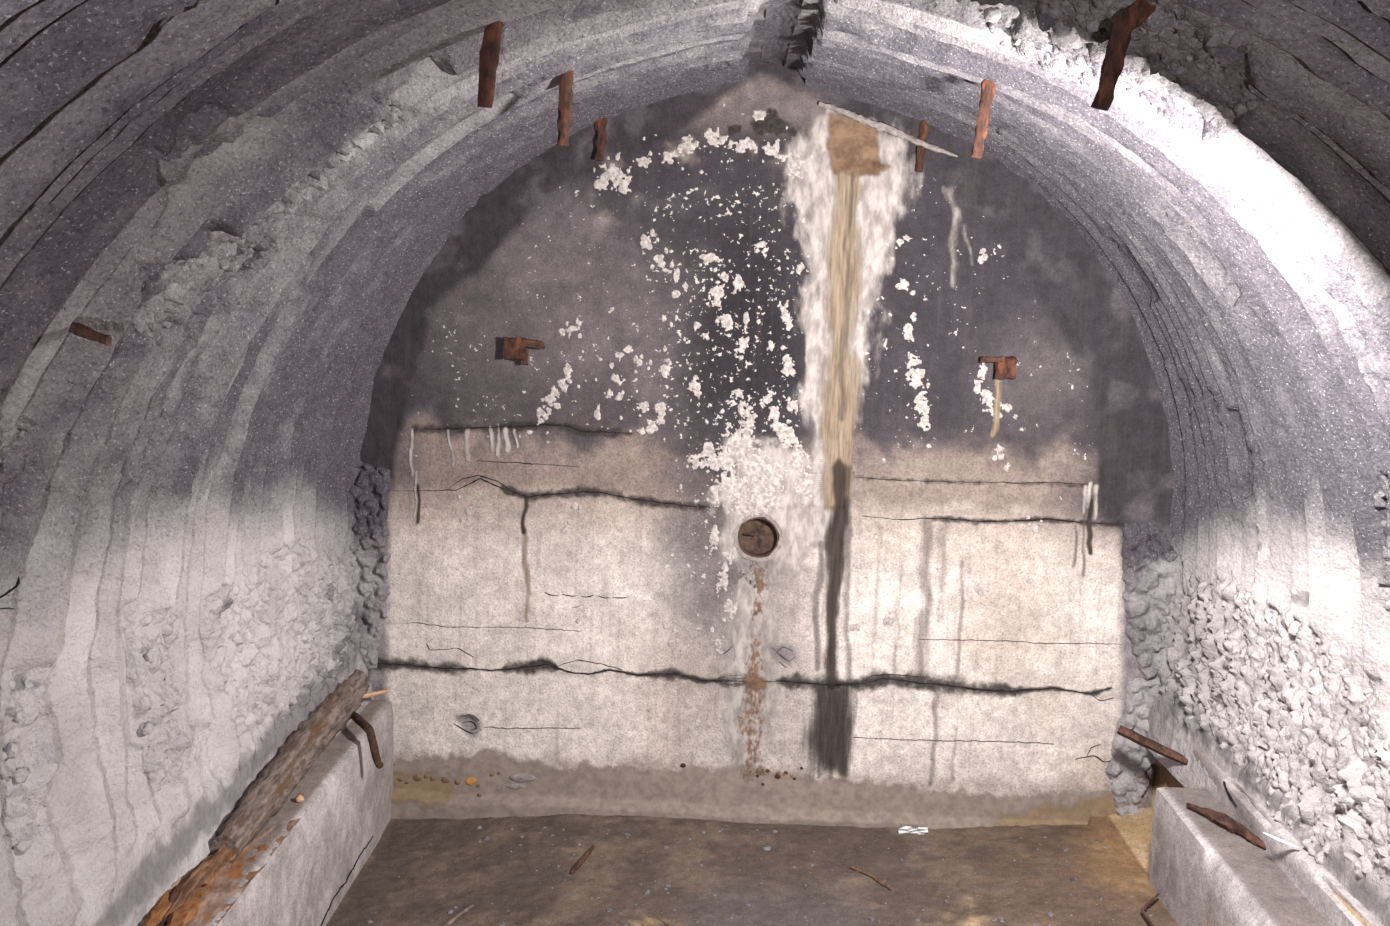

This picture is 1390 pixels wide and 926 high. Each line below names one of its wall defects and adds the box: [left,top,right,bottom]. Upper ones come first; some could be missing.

spalling [131,177,308,333]
crack [393,423,720,512]
water stain [391,109,1118,829]
crack [853,477,1089,486]
crack [865,516,1120,526]
spalling [123,610,191,795]
spalling [199,459,391,738]
crack [375,592,1112,701]
rust [753,568,763,615]
rust [742,639,784,776]
crack [853,737,1111,762]
spalling [1105,520,1390,880]